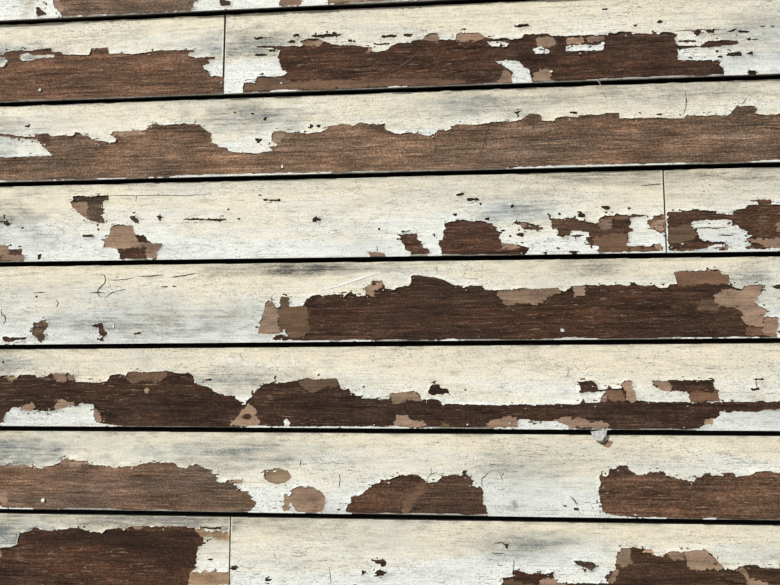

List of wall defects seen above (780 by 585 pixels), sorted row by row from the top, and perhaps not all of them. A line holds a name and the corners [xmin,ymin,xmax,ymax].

peeling [0,48,224,101]
peeling [243,20,758,92]
peeling [0,105,780,181]
peeling [71,195,162,259]
peeling [433,199,780,255]
peeling [258,268,780,341]
peeling [0,370,780,448]
peeling [0,458,256,512]
peeling [337,470,488,515]
peeling [598,465,780,520]
peeling [0,525,239,585]
peeling [500,546,780,585]